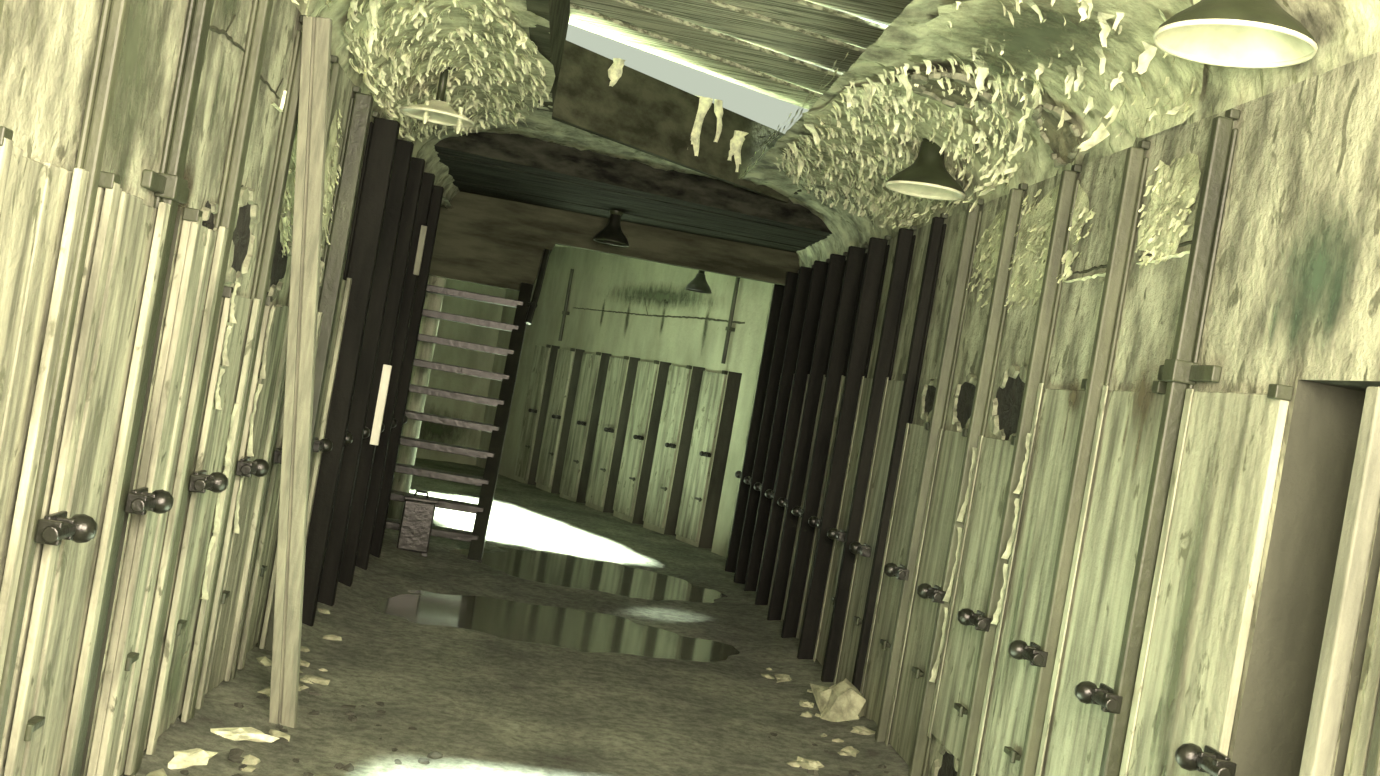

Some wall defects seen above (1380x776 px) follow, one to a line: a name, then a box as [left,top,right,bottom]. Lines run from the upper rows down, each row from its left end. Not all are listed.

crack [209,15,287,112]
flaking render [319,109,342,286]
flaking render [341,0,555,142]
flaking render [739,0,1204,313]
spalling [199,124,298,599]
spalling [920,377,938,423]
spalling [951,373,977,432]
peeling [929,447,977,683]
spalling [990,365,1032,625]
spalling [931,744,959,776]